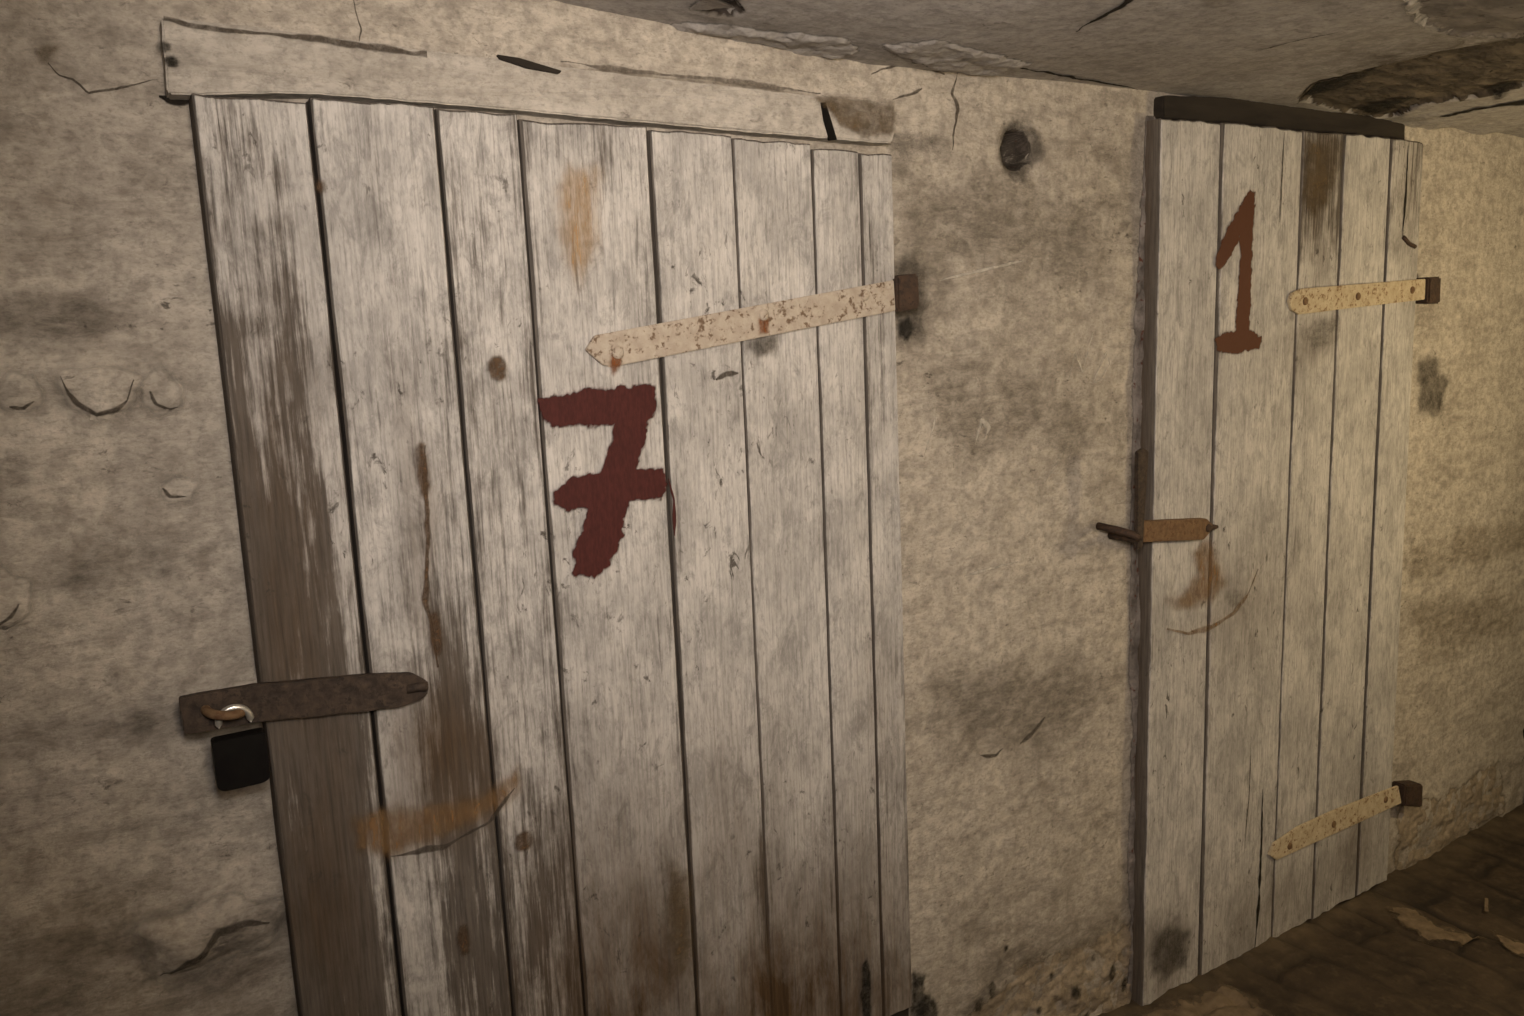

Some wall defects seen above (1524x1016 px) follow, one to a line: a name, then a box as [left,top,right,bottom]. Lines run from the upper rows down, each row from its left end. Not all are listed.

crack [1076,0,1133,32]
spalling [1299,0,1524,118]
leakage [1419,362,1447,410]